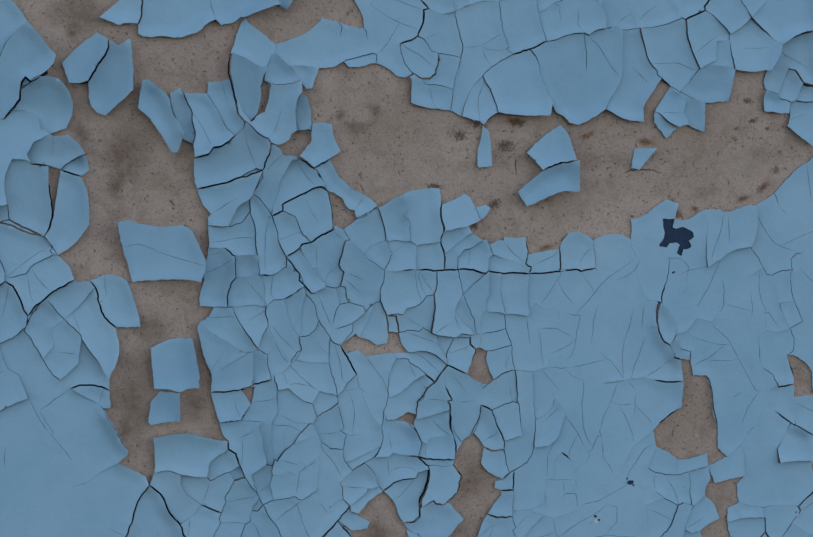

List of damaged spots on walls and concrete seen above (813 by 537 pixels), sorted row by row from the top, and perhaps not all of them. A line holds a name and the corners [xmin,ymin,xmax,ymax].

crack [5,65,54,118]
crack [81,41,109,84]
crack [345,0,709,125]
crack [747,31,813,120]
crack [0,126,116,455]
peeling [0,0,565,537]
crack [125,53,813,537]
peeling [175,0,813,470]
crack [107,477,190,537]
peeling [645,303,813,537]